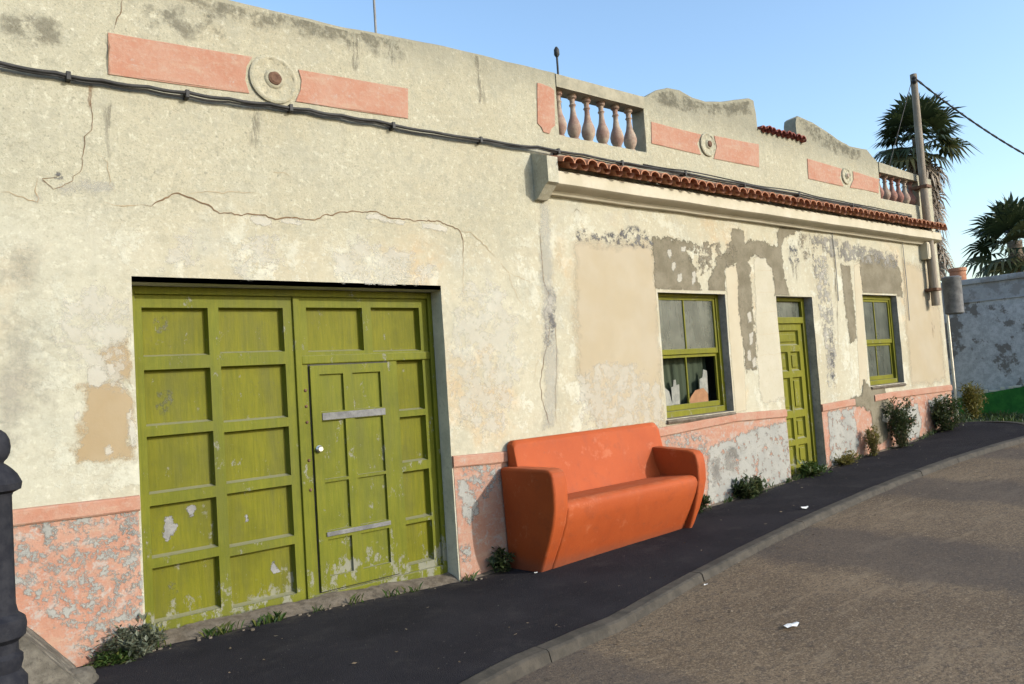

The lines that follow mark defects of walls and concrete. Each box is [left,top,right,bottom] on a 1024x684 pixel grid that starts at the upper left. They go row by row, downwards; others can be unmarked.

crack [10,93,549,301]
spalling [651,227,801,370]
spalling [840,254,903,344]
peeling [74,339,136,462]
peeling [162,516,178,542]
peeling [457,465,500,525]
crack [535,319,557,429]
peeling [665,422,791,505]
peeling [827,379,949,466]
peeling [14,511,145,659]